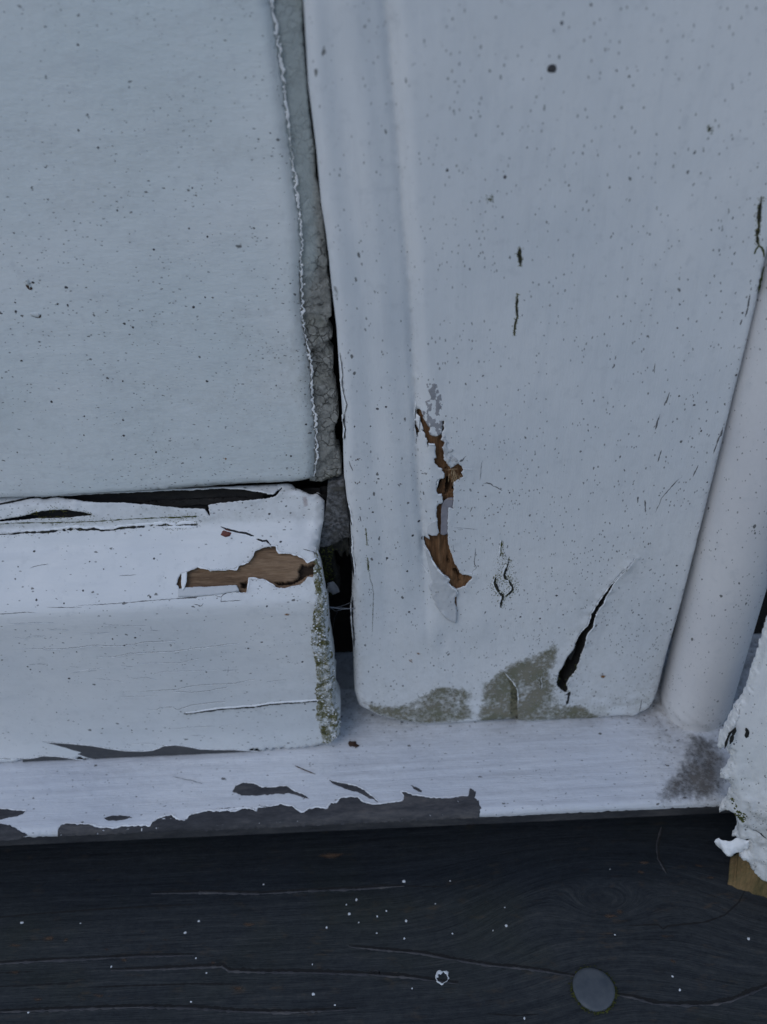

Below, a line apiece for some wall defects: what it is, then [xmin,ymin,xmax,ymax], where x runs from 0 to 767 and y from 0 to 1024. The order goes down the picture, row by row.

crack [0,496,271,545]
peeling [414,383,476,623]
peeling [178,572,239,597]
crack [453,508,514,608]
crack [505,558,636,718]
peeling [0,742,260,762]
peeling [0,808,27,841]
peeling [57,777,481,837]